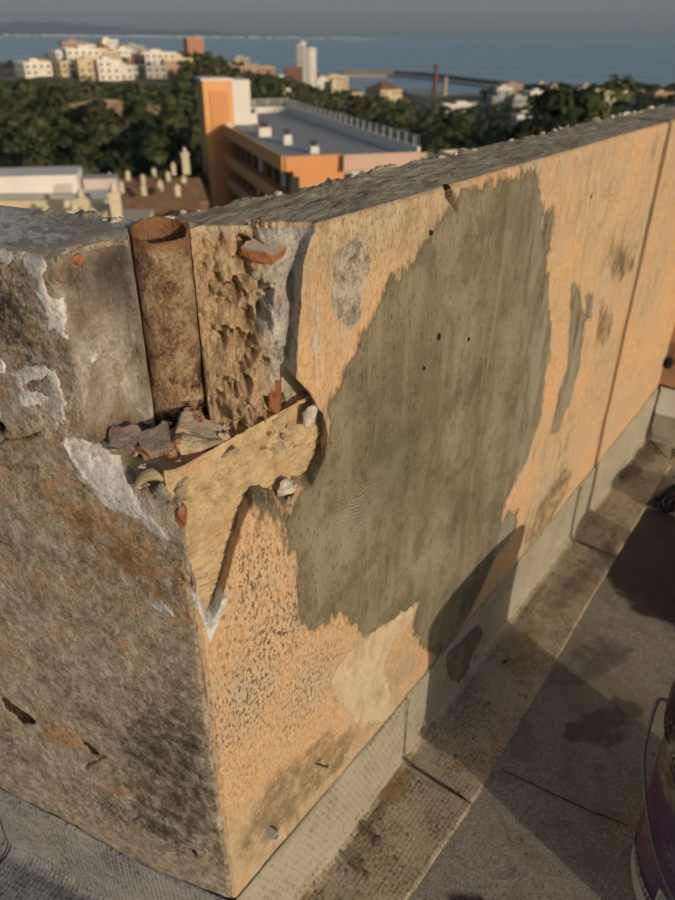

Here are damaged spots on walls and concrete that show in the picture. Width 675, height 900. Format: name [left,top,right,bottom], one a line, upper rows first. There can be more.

flaking render [332,234,371,330]
spalling [189,225,327,455]
spalling [0,237,197,593]
spalling [219,473,307,592]
peeling [151,600,174,617]
spalling [1,697,36,725]
flaking render [45,726,100,758]